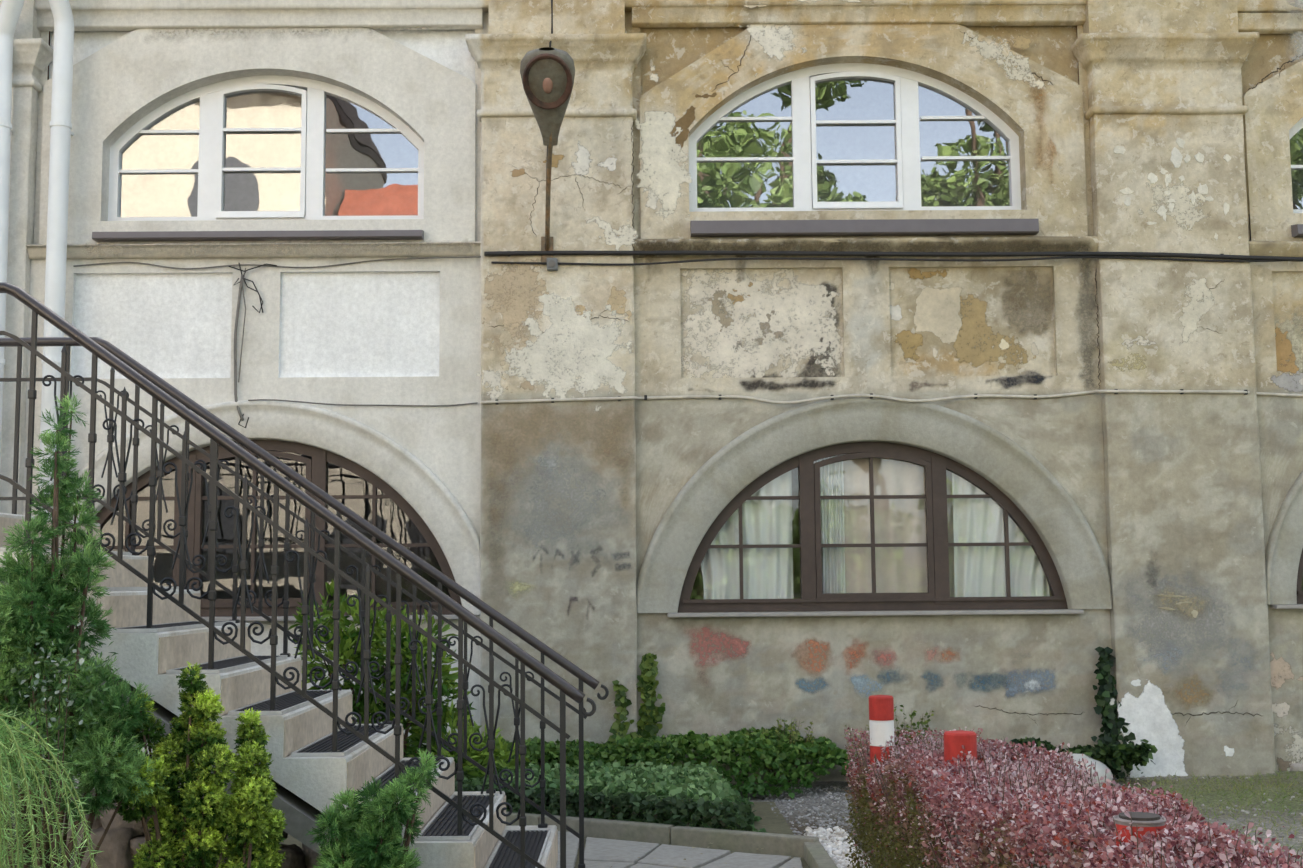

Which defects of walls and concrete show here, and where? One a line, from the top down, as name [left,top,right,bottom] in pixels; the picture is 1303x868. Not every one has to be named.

crack [711,36,751,92]
peeling [963,33,1052,89]
crack [513,125,635,250]
peeling [543,142,617,176]
peeling [586,217,638,251]
flaking render [633,93,717,218]
peeling [1119,138,1230,231]
peeling [476,259,634,412]
peeling [681,269,844,378]
flaking render [889,268,1038,369]
flaking render [1271,327,1303,392]
peeling [1110,679,1188,778]